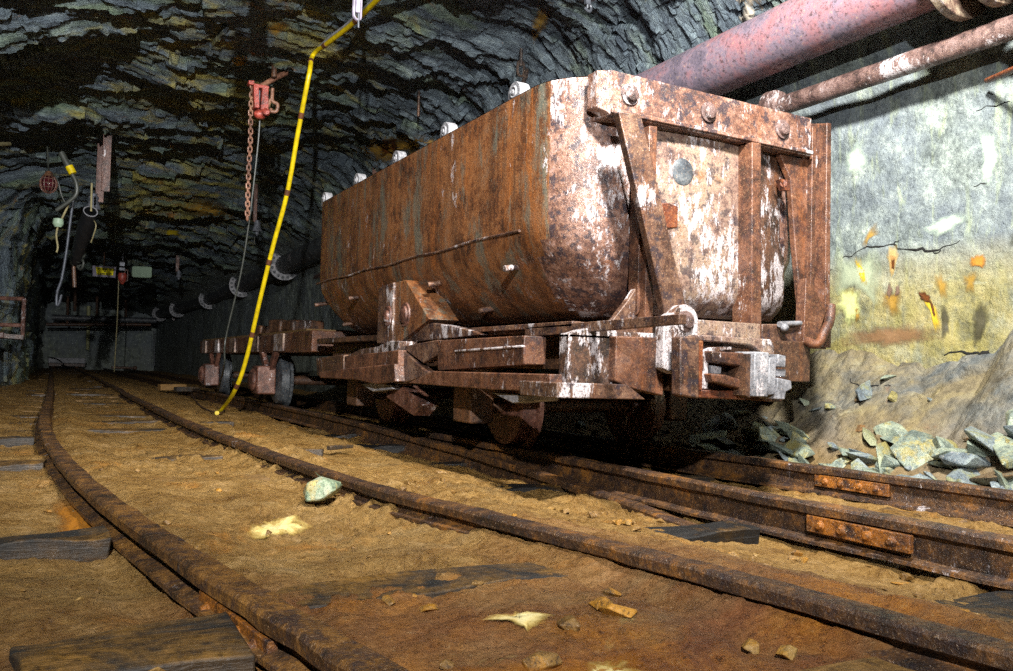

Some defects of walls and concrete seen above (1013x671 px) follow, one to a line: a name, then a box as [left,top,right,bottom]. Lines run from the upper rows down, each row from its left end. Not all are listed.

corrosion [885,248,899,312]
crack [831,240,960,270]
corrosion [965,255,985,288]
corrosion [840,292,859,321]
corrosion [919,278,945,327]
corrosion [856,329,920,344]